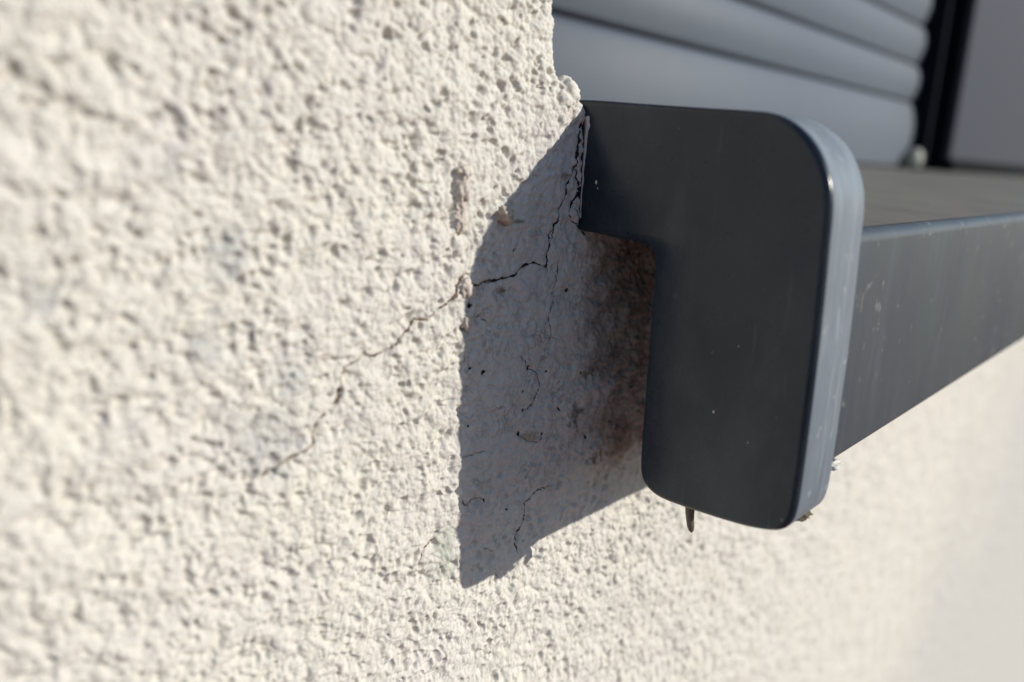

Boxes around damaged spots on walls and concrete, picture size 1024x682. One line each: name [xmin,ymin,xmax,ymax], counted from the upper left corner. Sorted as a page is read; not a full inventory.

crack [260,122,586,476]
crack [485,486,551,576]